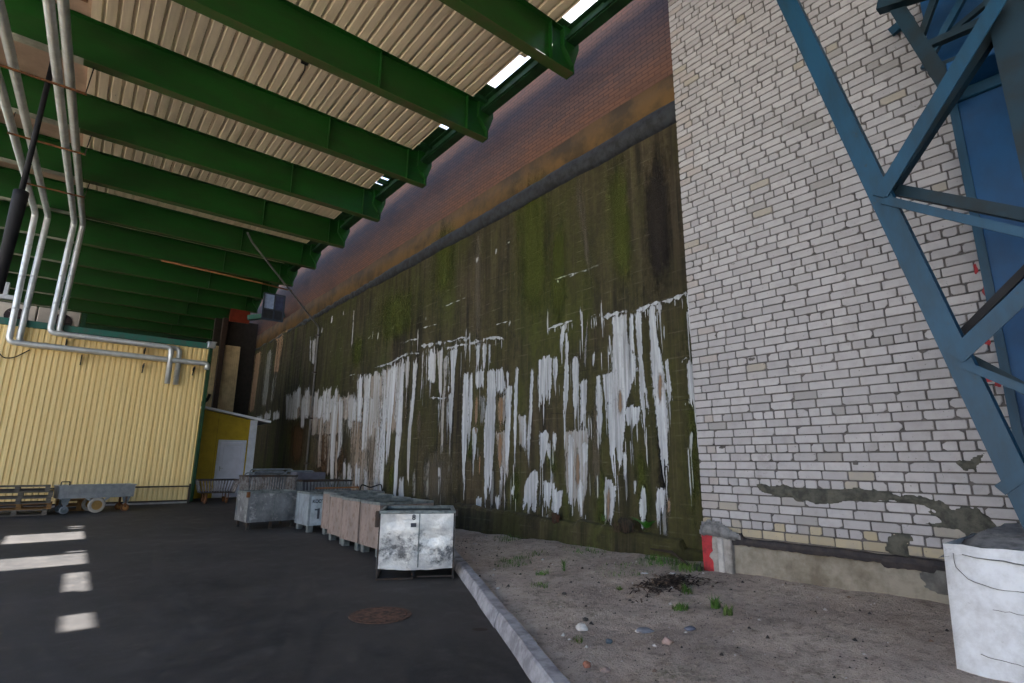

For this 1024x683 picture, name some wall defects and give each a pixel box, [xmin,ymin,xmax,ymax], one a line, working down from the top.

damp [257,146,698,536]